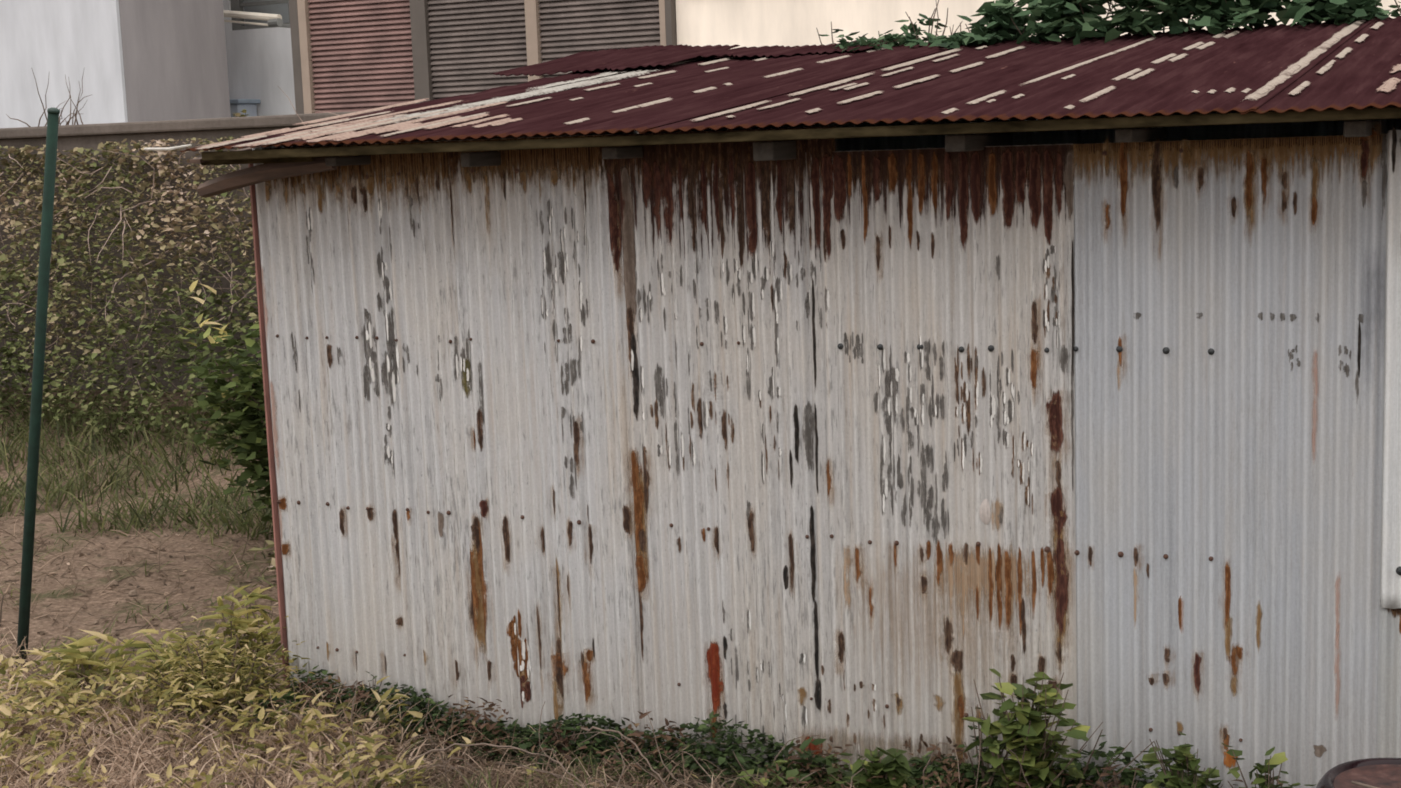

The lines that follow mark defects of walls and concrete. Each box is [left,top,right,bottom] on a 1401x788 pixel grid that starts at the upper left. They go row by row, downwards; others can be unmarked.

corrosion [470,500,491,680]
corrosion [502,516,510,562]
corrosion [507,528,594,720]
peeling [539,199,589,498]
corrosion [622,451,649,659]
corrosion [705,642,724,742]
peeling [630,240,830,492]
corrosion [262,126,1386,421]
peeling [844,332,1033,543]
corrosion [920,390,1069,760]
peeling [1042,245,1068,373]
corrosion [1225,563,1262,696]